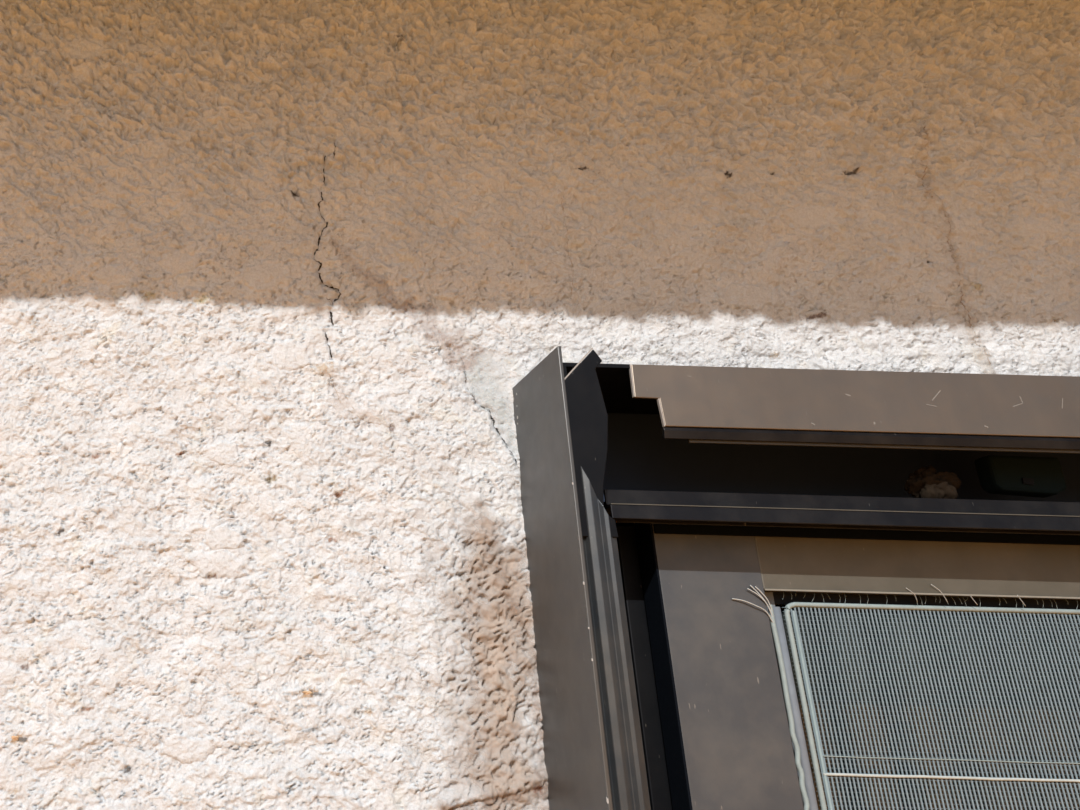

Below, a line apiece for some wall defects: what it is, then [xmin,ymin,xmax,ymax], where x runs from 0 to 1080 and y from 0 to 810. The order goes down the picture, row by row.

crack [314,142,390,428]
crack [463,362,517,464]